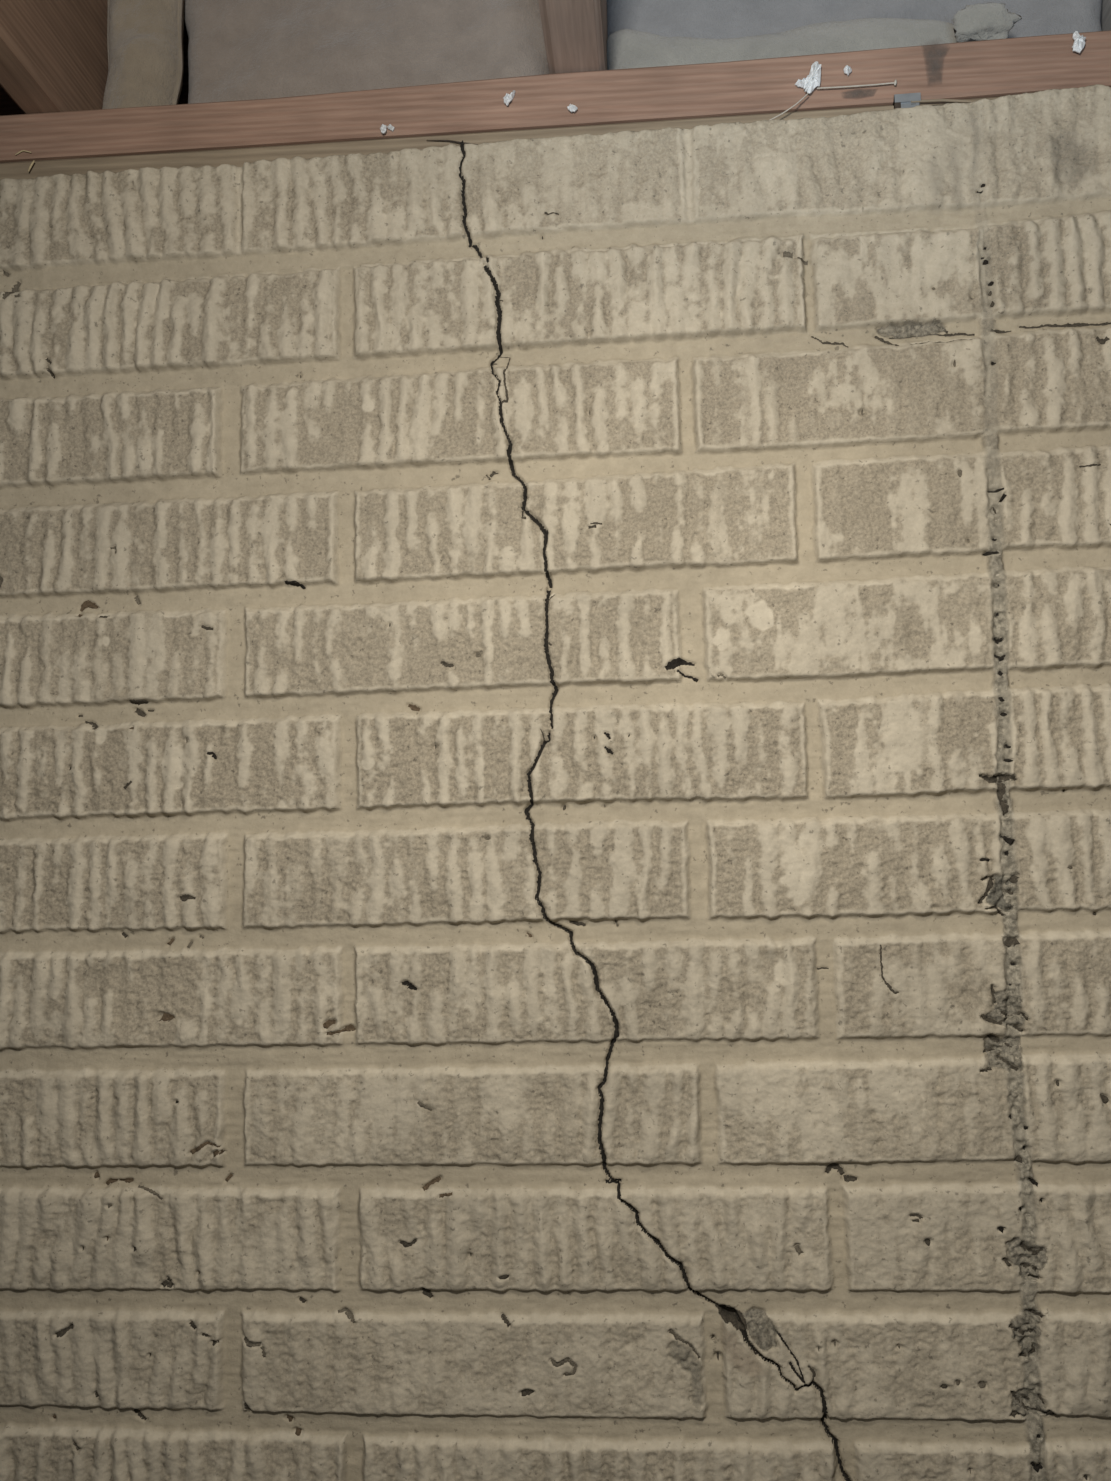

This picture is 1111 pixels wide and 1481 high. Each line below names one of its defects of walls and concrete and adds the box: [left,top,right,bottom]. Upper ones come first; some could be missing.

crack [459,140,851,1481]